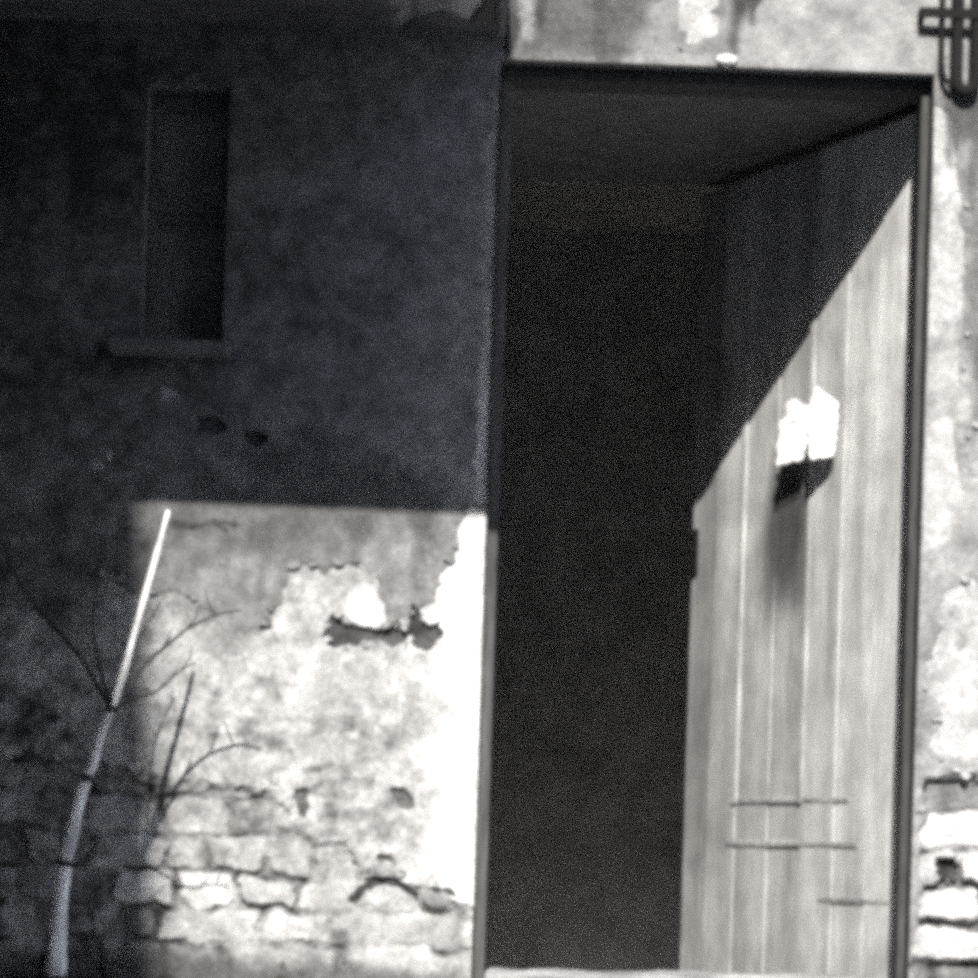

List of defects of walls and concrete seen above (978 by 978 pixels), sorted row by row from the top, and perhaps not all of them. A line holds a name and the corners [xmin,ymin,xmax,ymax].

flaking render [387,0,482,27]
flaking render [0,92,499,978]
flaking render [910,574,978,978]